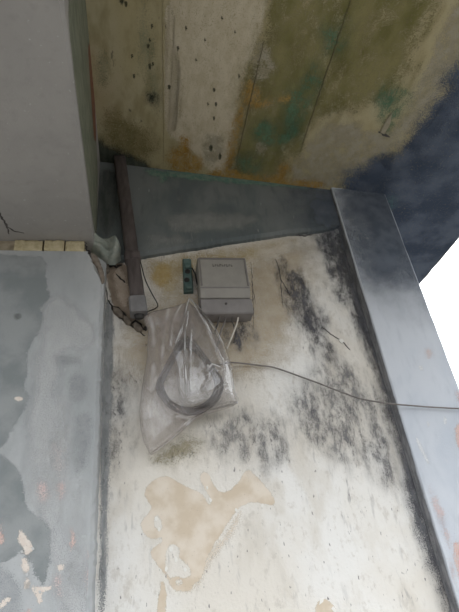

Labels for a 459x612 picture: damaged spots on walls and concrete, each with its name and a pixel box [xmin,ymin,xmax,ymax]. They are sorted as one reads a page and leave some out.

rust [166,76,330,188]
water stain [96,0,459,612]
peeling [17,530,64,612]
peeling [140,470,275,612]